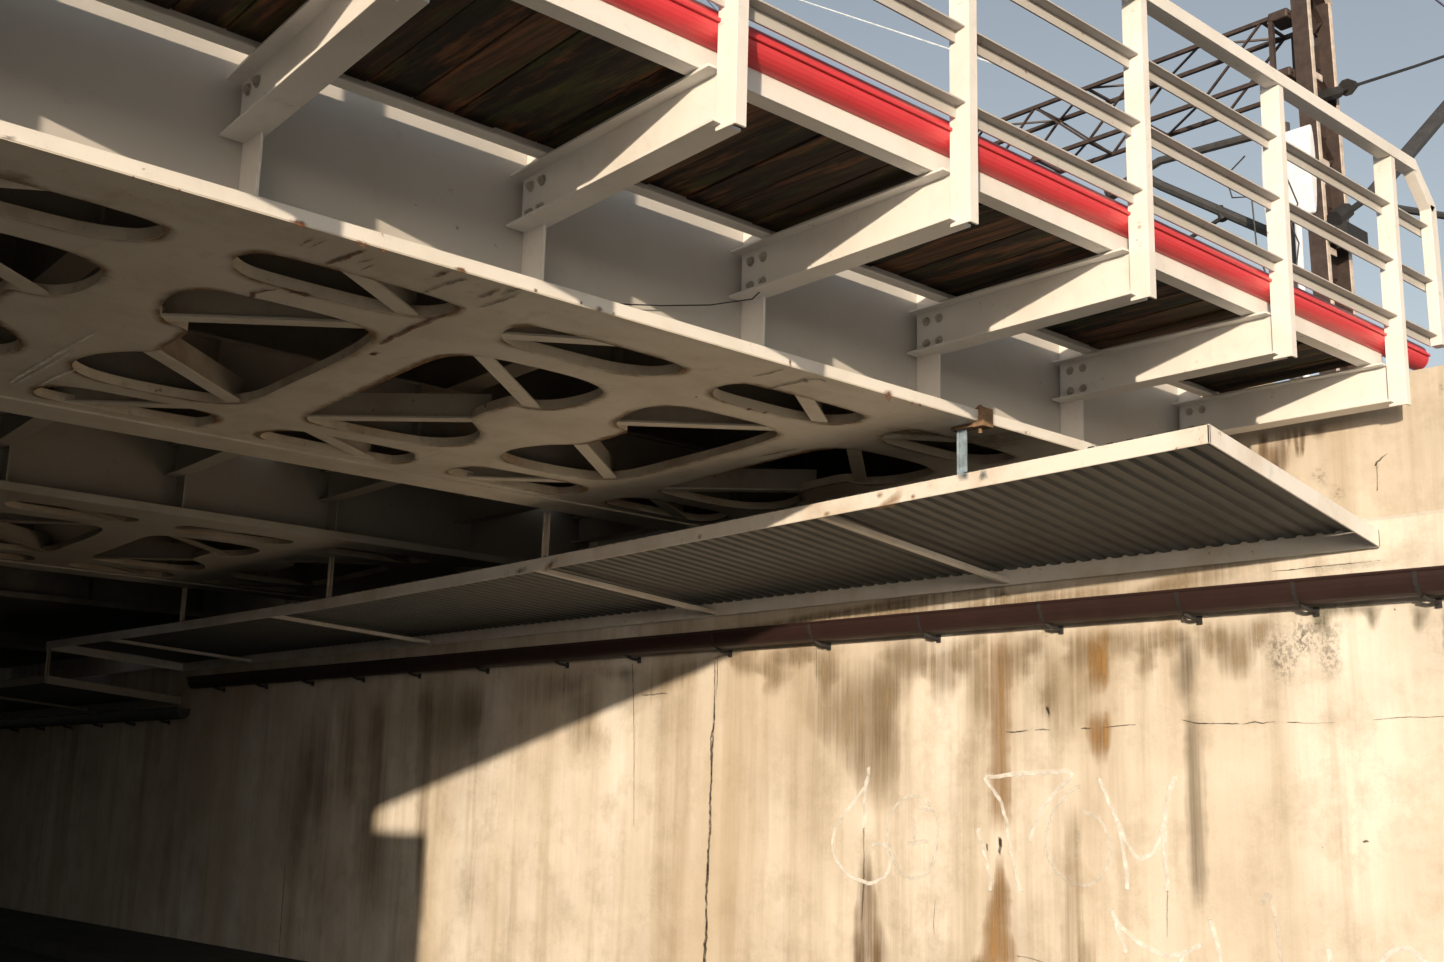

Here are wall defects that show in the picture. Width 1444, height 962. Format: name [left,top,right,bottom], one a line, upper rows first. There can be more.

water stain [764,648,832,687]
water stain [895,646,968,679]
corrosion [1089,642,1107,682]
water stain [1206,624,1264,670]
corrosion [995,649,1007,810]
corrosion [1091,718,1108,751]
crack [1184,718,1333,726]
crack [703,658,718,962]
corrosion [988,873,1008,962]